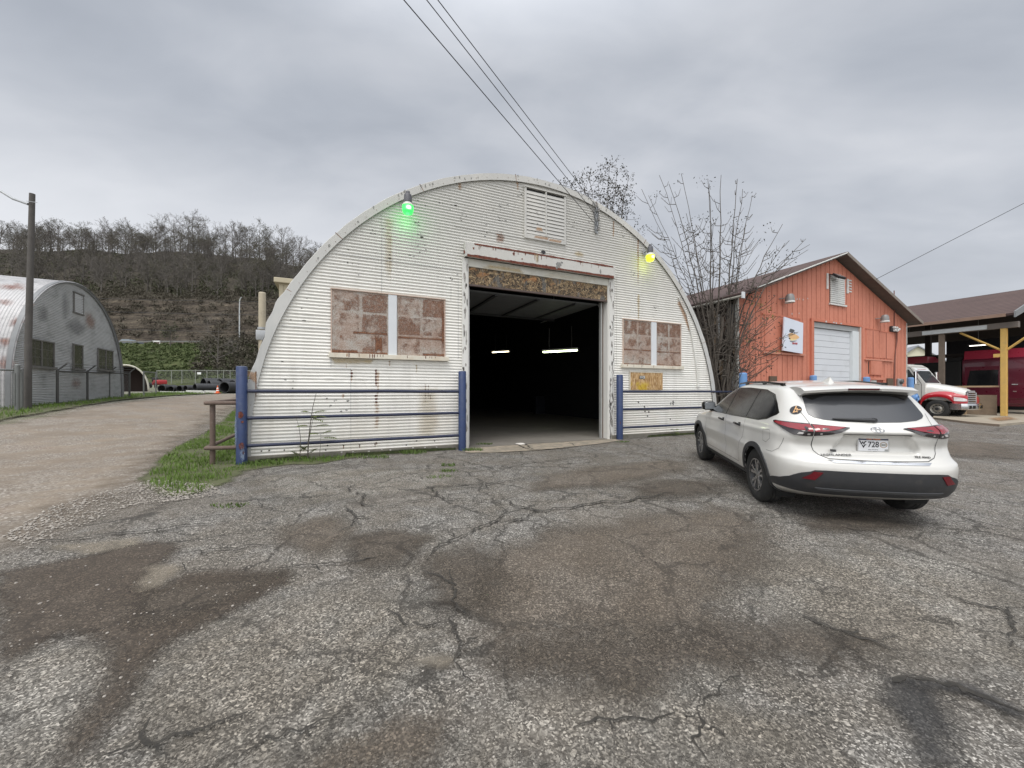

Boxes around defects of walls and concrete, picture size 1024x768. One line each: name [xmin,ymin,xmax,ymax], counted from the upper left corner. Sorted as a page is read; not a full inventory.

corrosion [332,294,444,425]
crack [39,346,706,682]
crack [575,675,743,758]